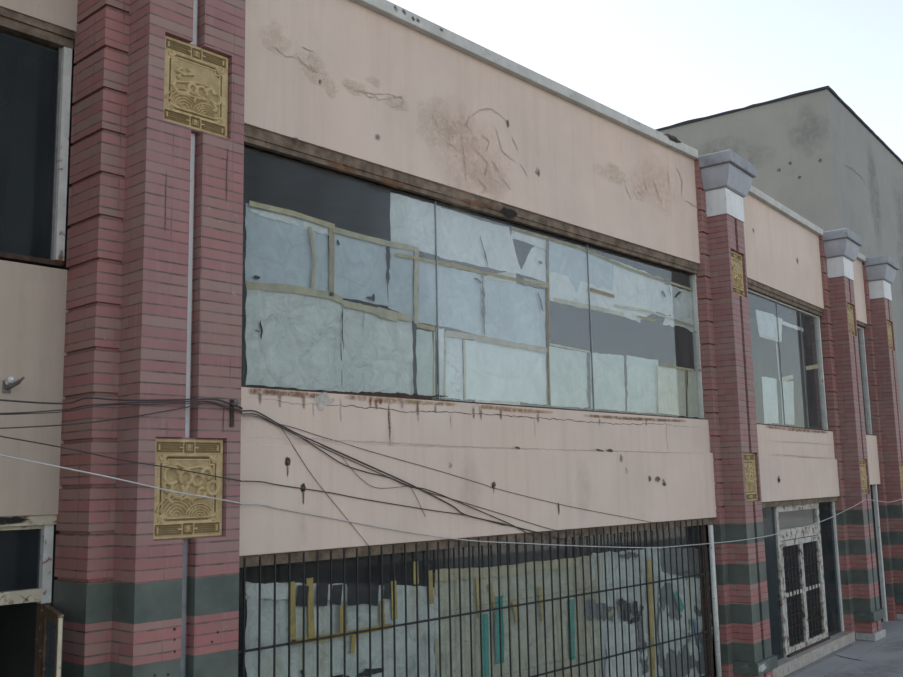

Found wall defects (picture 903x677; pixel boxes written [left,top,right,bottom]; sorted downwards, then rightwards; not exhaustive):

rust [251,389,319,407]
rust [473,406,543,421]